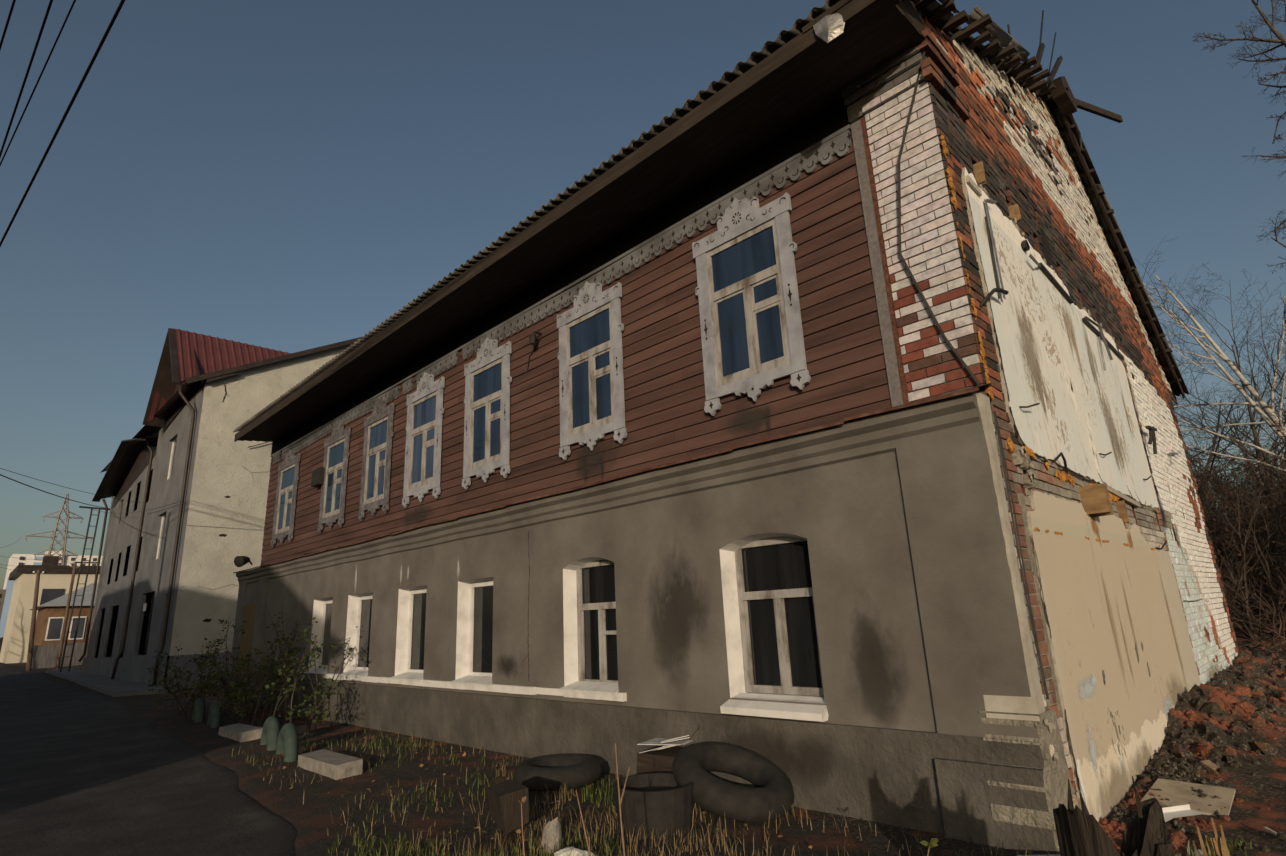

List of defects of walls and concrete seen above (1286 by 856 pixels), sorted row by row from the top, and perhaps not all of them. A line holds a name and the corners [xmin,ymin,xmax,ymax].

damp [1020,321,1045,410]
damp [1064,314,1131,467]
damp [656,573,698,657]
damp [857,622,896,707]
peeling [1185,580,1222,670]
spalling [1043,717,1058,761]
spalling [1086,708,1127,779]